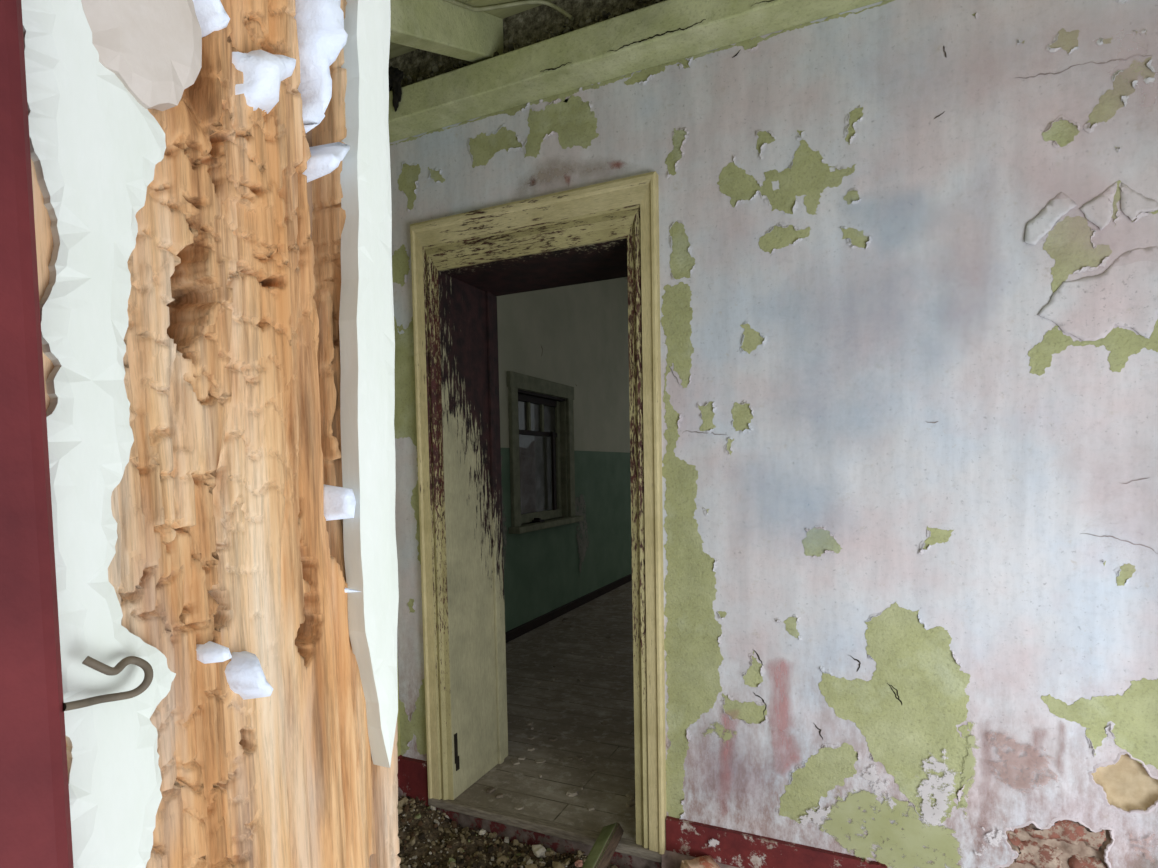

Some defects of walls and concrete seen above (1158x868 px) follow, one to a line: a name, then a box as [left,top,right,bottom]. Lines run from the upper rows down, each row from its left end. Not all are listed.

peeling [390,0,894,168]
crack [610,19,706,51]
peeling [1042,56,1156,148]
peeling [717,130,862,254]
peeling [392,244,410,287]
peeling [1025,180,1158,376]
peeling [394,316,421,565]
peeling [661,220,769,819]
peeling [399,679,427,756]
peeling [774,602,1058,868]
peeling [1041,678,1158,814]
spalling [975,817,1115,868]